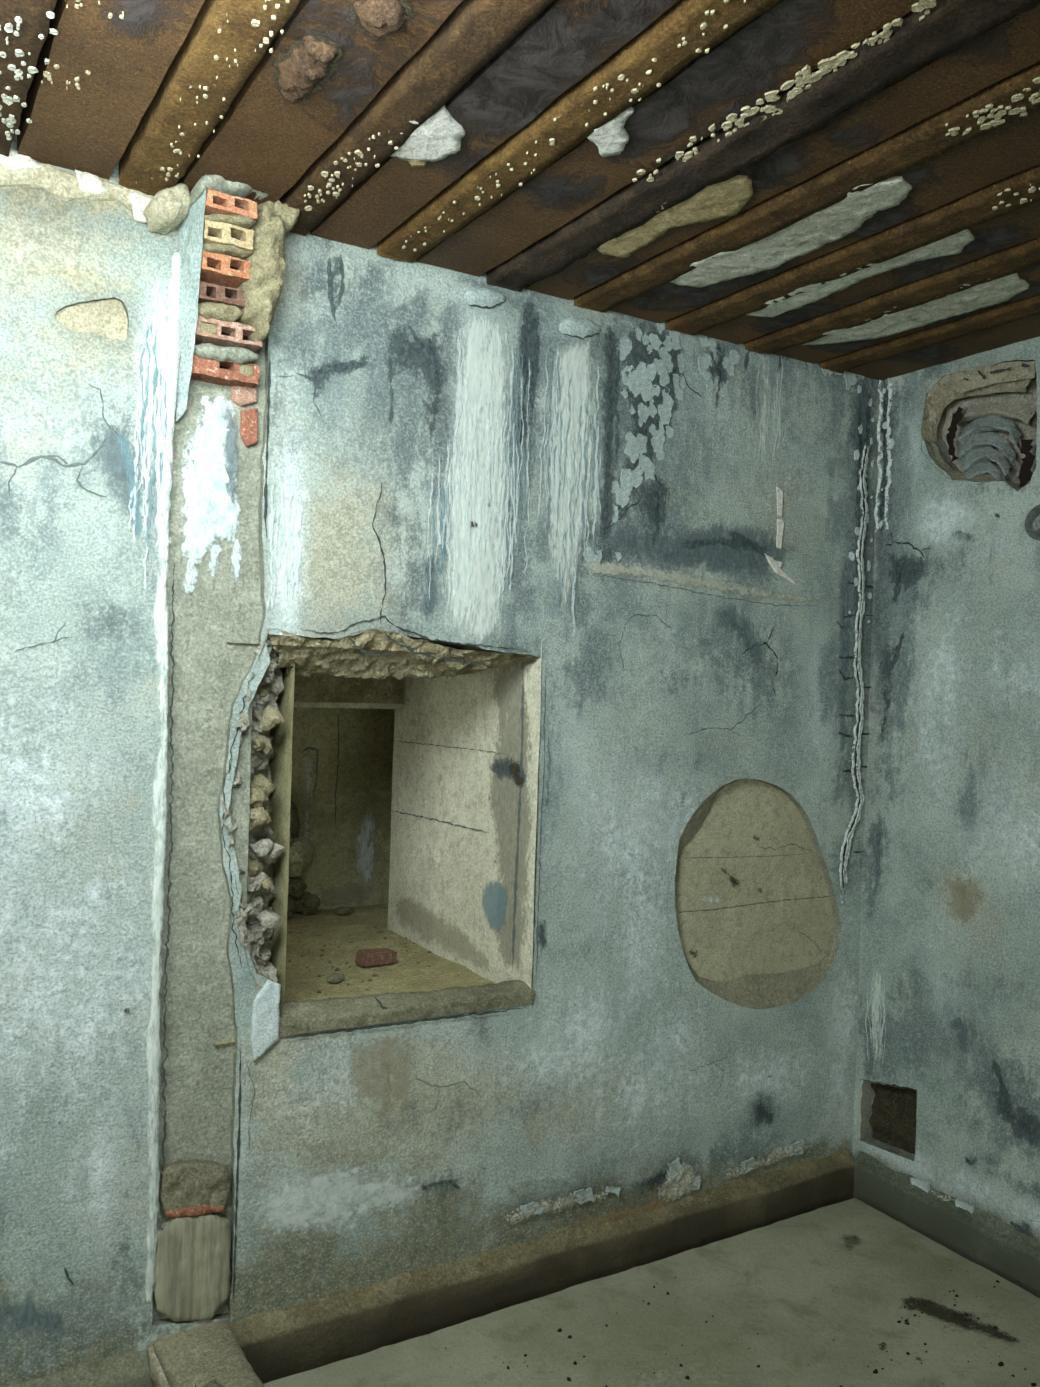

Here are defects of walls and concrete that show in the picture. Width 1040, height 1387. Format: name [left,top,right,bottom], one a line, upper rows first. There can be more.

corrosion [271,34,342,104]
corrosion [347,0,414,37]
crack [0,384,136,497]
leakage [327,255,345,321]
leakage [305,355,367,397]
leakage [386,301,780,640]
peeling [611,321,740,523]
leakage [840,385,895,758]
flaking render [144,253,258,1301]
spalling [220,629,535,992]
crack [300,483,547,973]
spalling [675,778,838,1009]